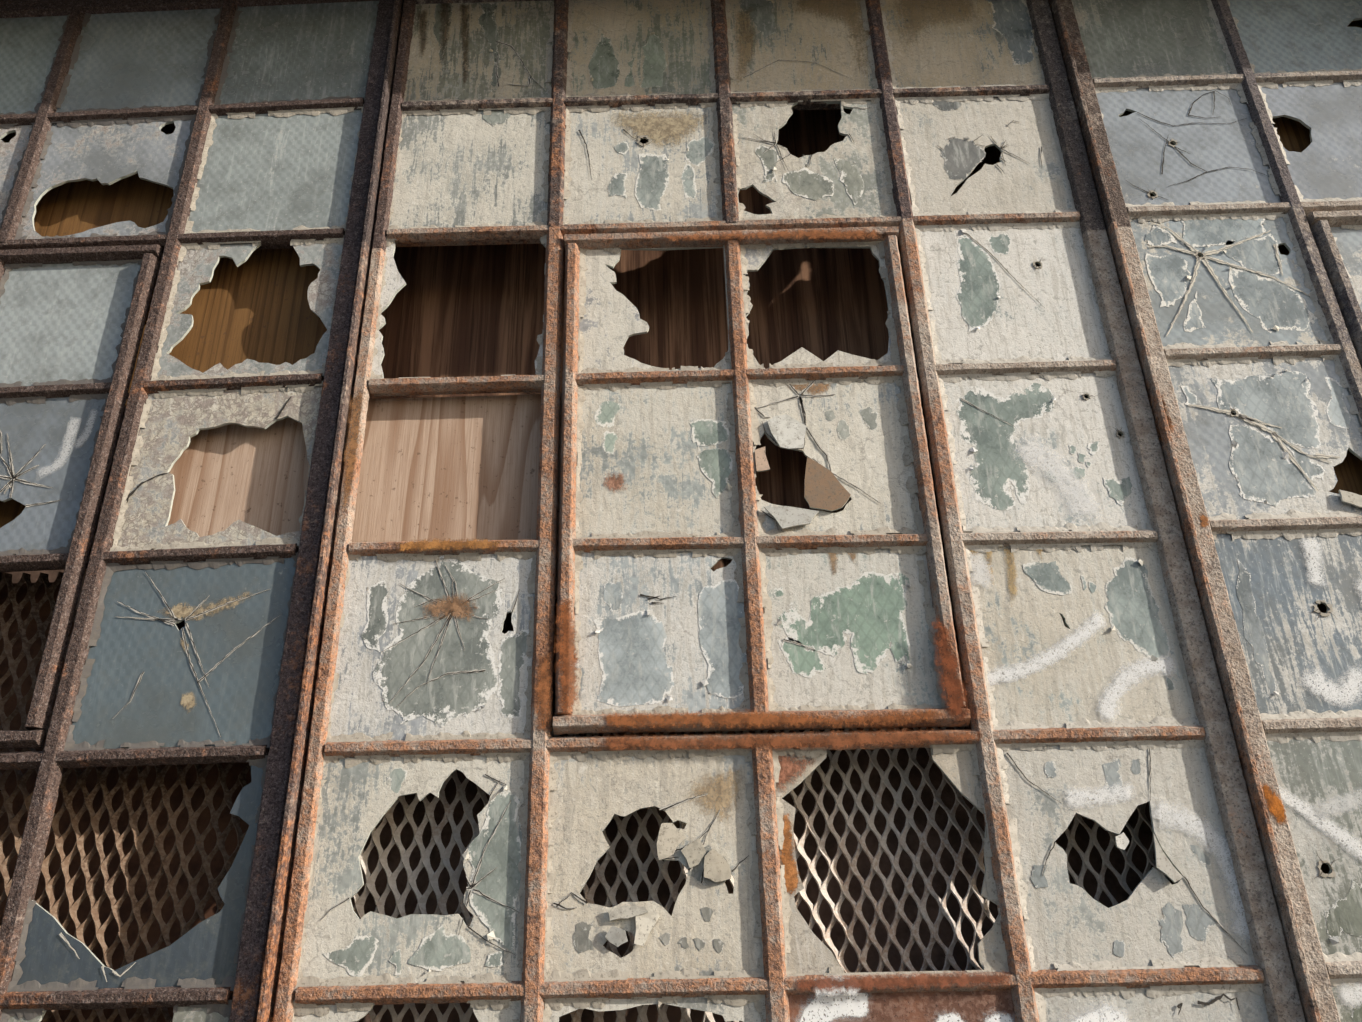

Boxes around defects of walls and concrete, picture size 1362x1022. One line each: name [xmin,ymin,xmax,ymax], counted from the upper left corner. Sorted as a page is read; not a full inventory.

rust [664,228,880,241]
peeling [956,229,1012,332]
crack [1126,91,1310,336]
crack [0,431,62,507]
peeling [956,383,1056,510]
crack [1189,404,1340,491]
crack [112,571,283,737]
peeling [361,555,529,727]
rust [536,599,578,729]
rust [606,619,983,789]
peeling [774,571,913,678]
rust [1262,785,1286,824]